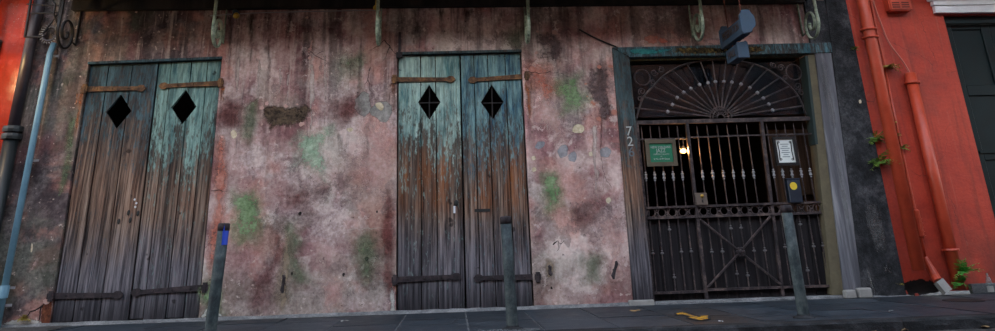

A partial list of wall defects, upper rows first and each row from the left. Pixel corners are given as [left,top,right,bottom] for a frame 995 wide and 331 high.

spalling [259,101,311,130]